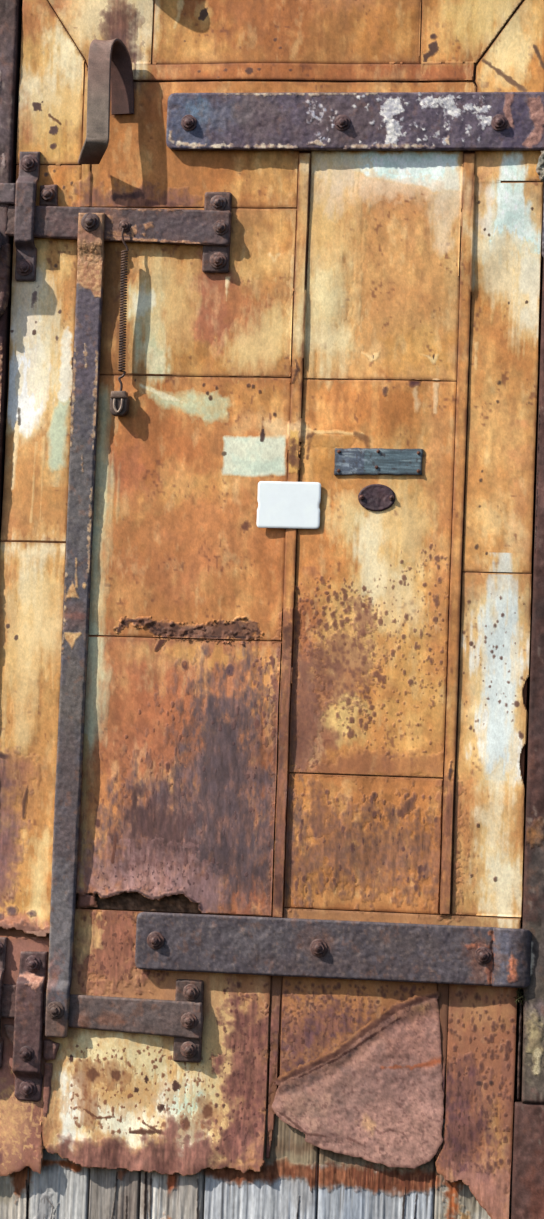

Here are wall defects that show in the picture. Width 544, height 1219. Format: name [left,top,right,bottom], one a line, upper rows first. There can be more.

spalling [77,654,279,909]
rust [72,606,479,997]
rust [0,928,521,1219]